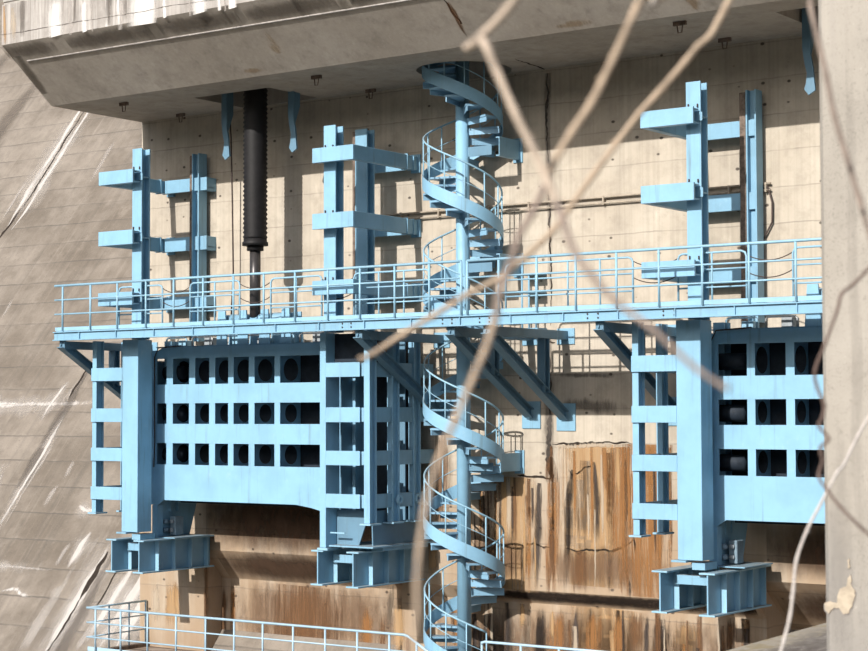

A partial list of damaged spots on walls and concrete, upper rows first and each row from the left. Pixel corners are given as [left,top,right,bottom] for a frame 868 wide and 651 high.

leakage [49,1,61,37]
leakage [71,0,236,45]
leakage [250,0,324,17]
crack [444,0,464,32]
leakage [6,44,46,92]
crack [0,111,88,237]
leakage [0,371,86,522]
corrosion [471,444,672,598]
leakage [69,534,89,565]
crack [46,552,108,651]
peeling [824,559,857,616]
corrosion [550,606,642,651]